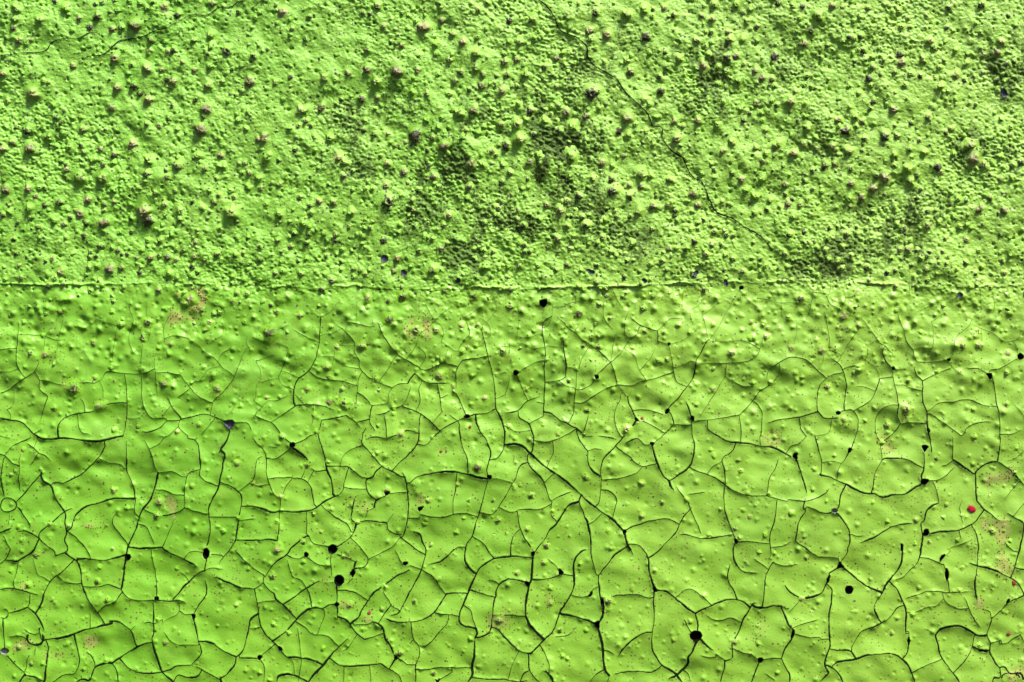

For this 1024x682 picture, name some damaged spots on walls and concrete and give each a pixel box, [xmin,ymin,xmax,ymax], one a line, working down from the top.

crack [539,0,772,250]
crack [0,282,1024,682]